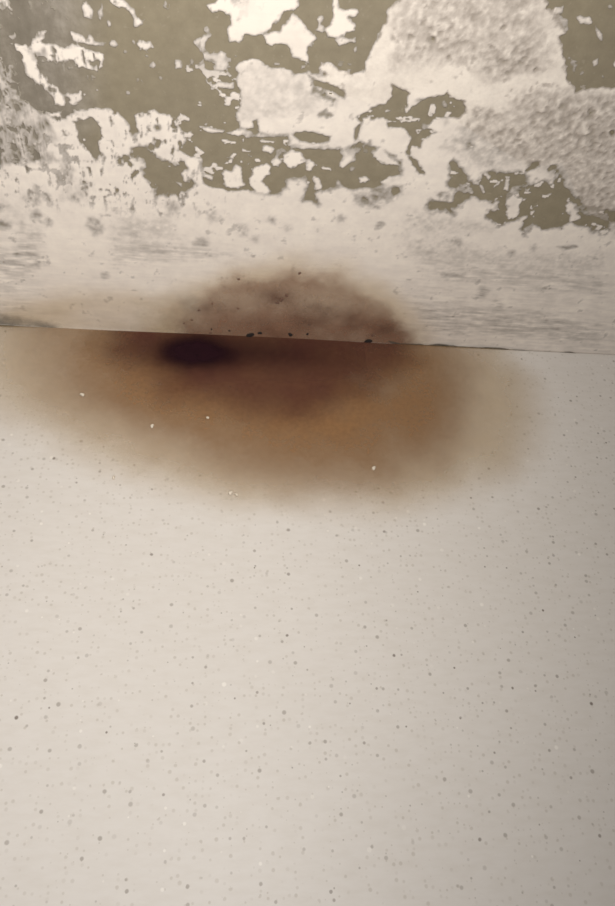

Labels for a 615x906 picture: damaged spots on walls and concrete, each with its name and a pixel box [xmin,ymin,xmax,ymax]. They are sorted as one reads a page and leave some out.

peeling [0,0,615,355]
water stain [14,294,504,478]